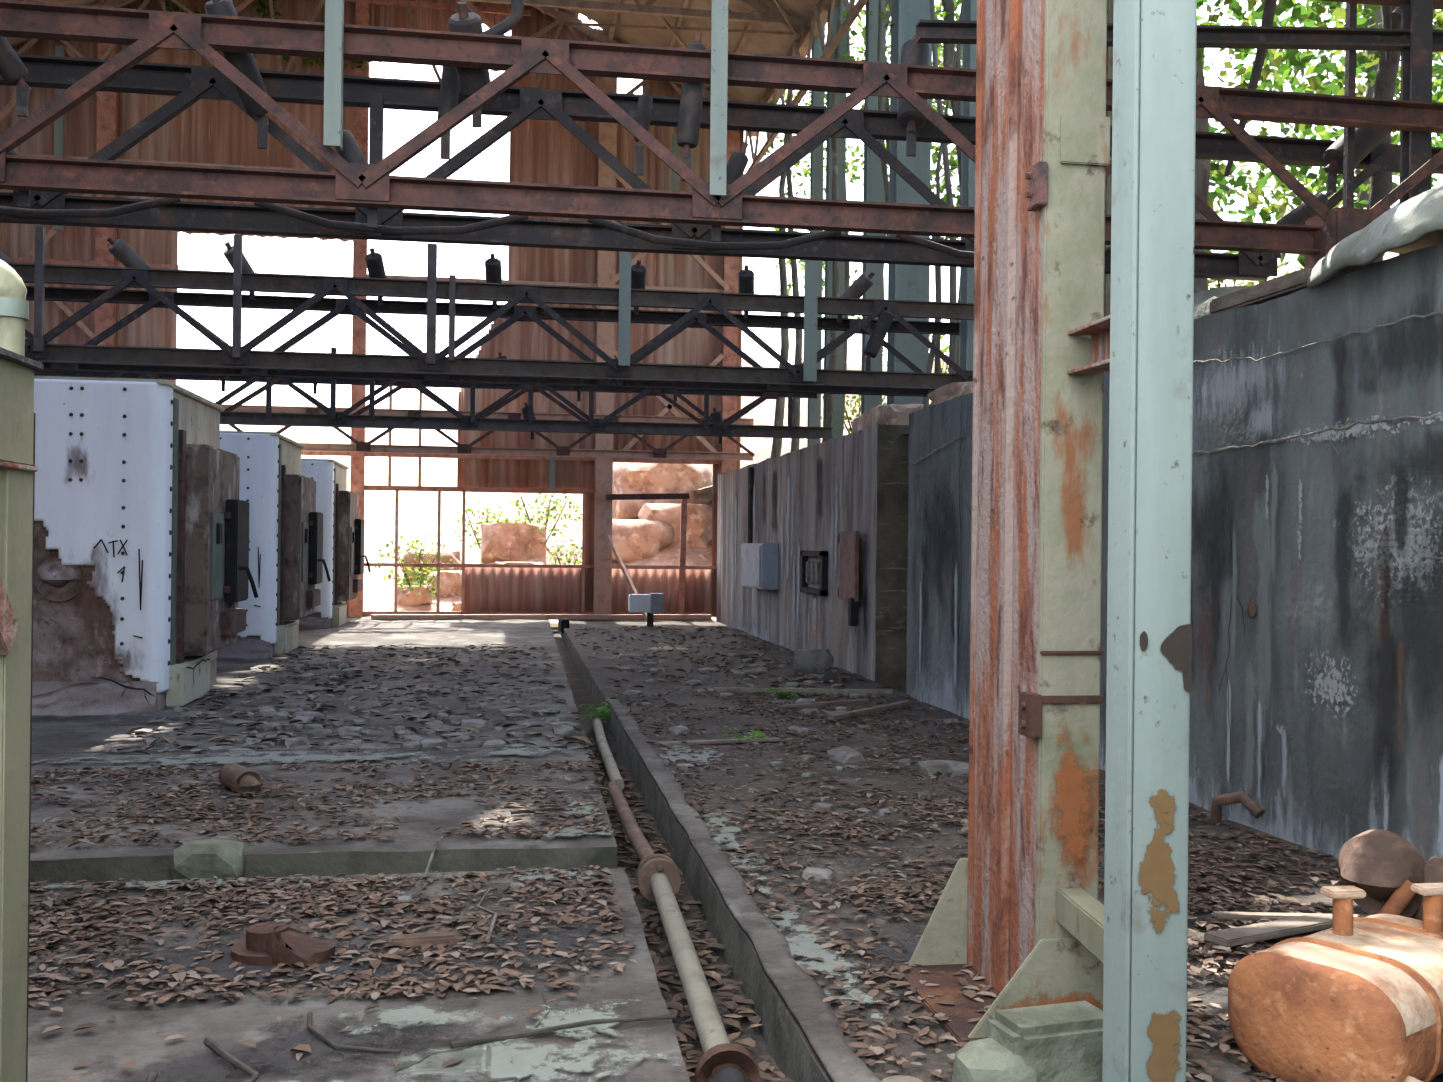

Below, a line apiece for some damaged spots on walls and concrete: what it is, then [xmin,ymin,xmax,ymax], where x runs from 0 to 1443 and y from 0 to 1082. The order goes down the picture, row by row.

leakage [1395,433,1443,550]
leakage [1335,490,1352,640]
peeling [1140,624,1192,693]
leakage [1189,465,1340,859]
leakage [1368,544,1443,830]
corrosion [1050,732,1098,864]
peeling [1139,789,1180,934]
peeling [1146,1011,1182,1082]